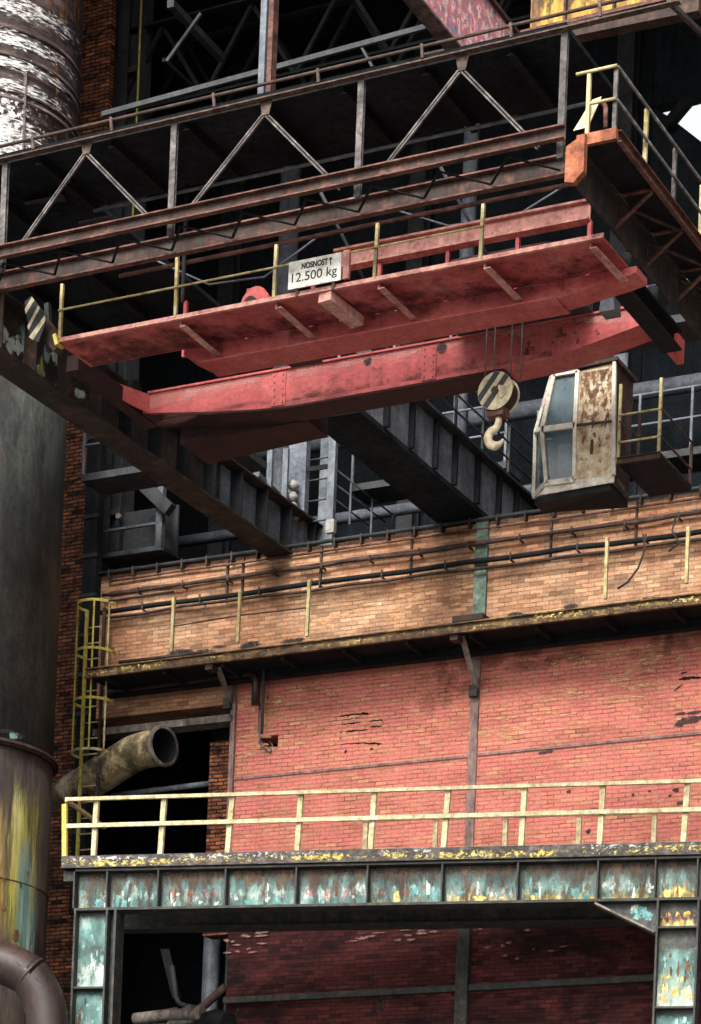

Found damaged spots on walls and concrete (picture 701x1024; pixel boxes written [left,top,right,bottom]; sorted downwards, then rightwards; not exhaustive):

peeling [0,0,80,154]
corrosion [578,368,612,448]
crack [674,671,701,691]
crack [339,712,384,753]
peeling [62,829,701,1024]